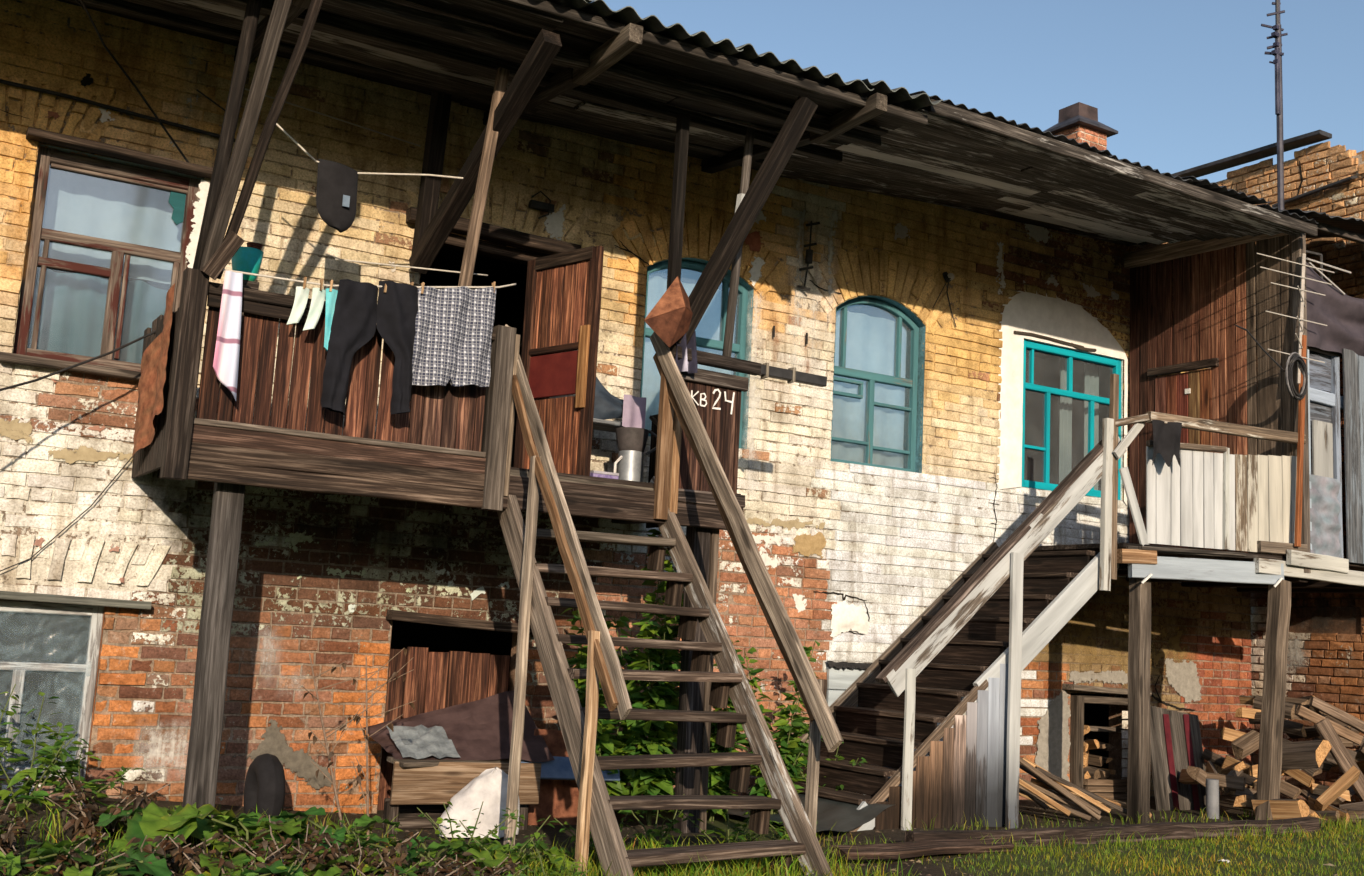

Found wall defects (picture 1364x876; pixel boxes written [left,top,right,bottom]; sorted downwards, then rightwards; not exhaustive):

peeling [0,418,33,444]
peeling [48,445,132,464]
peeling [252,527,319,552]
spalling [746,517,826,568]
peeling [470,582,510,600]
peeling [793,594,807,613]
peeling [1165,658,1202,703]